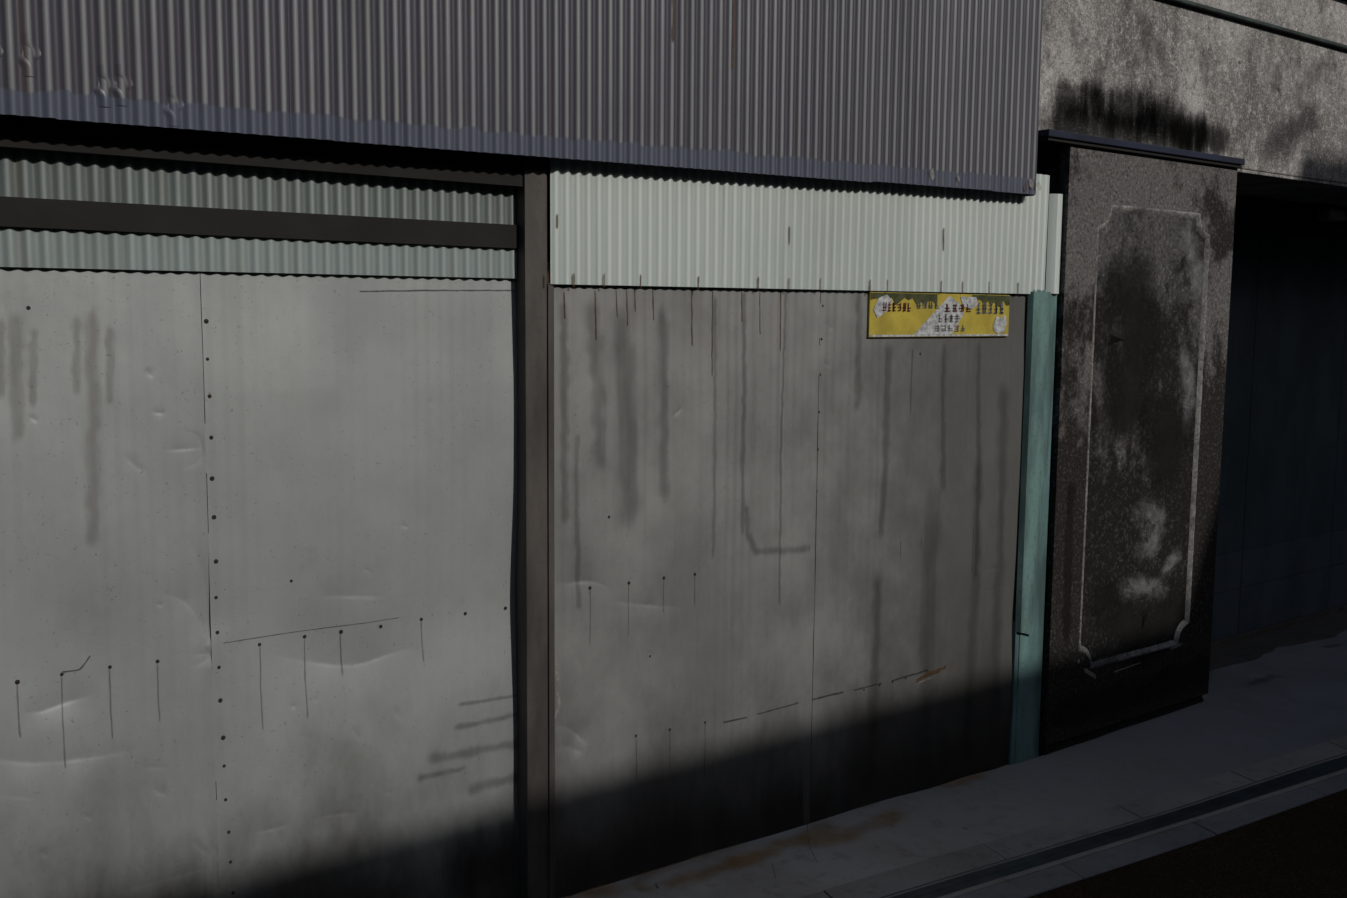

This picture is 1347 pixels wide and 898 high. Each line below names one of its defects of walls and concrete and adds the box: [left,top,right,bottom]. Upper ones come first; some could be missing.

leakage [1056,82,1208,152]